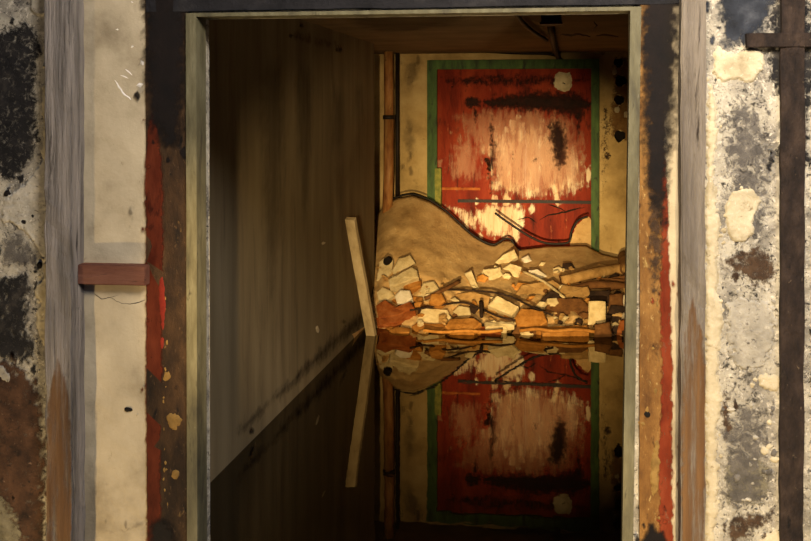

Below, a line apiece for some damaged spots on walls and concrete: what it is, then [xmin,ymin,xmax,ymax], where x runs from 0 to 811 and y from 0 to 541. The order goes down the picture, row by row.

damp [0,17,44,183]
peeling [124,116,182,541]
spalling [376,300,434,328]
peeling [449,115,591,242]
peeling [553,72,572,92]
peeling [570,217,591,248]
spalling [587,278,625,310]
corrosion [647,181,667,295]
flaking render [704,46,779,541]
damp [722,48,780,259]